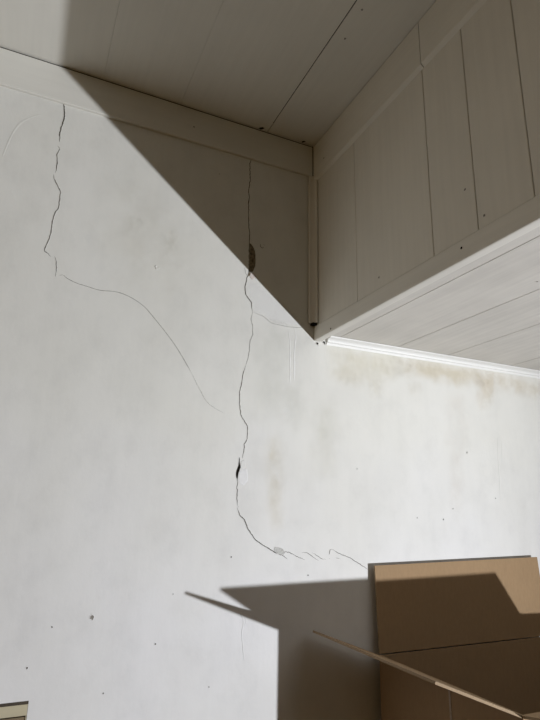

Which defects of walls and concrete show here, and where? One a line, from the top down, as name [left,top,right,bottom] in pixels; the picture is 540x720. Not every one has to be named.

crack [44,104,302,458]
spalling [248,243,256,279]
spalling [236,458,248,485]
crack [236,479,367,569]